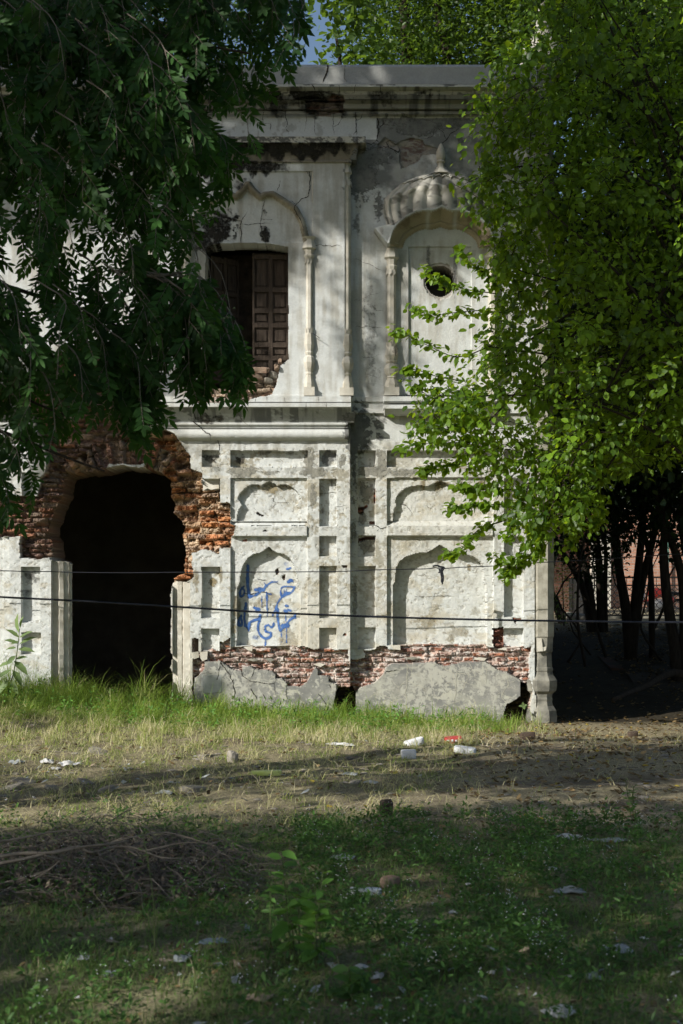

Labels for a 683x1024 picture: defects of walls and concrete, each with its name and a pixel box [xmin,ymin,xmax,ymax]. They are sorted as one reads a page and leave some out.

leakage [262,91,346,118]
spalling [378,138,437,169]
crack [229,171,340,247]
peeling [203,482,219,491]
spalling [192,618,546,721]